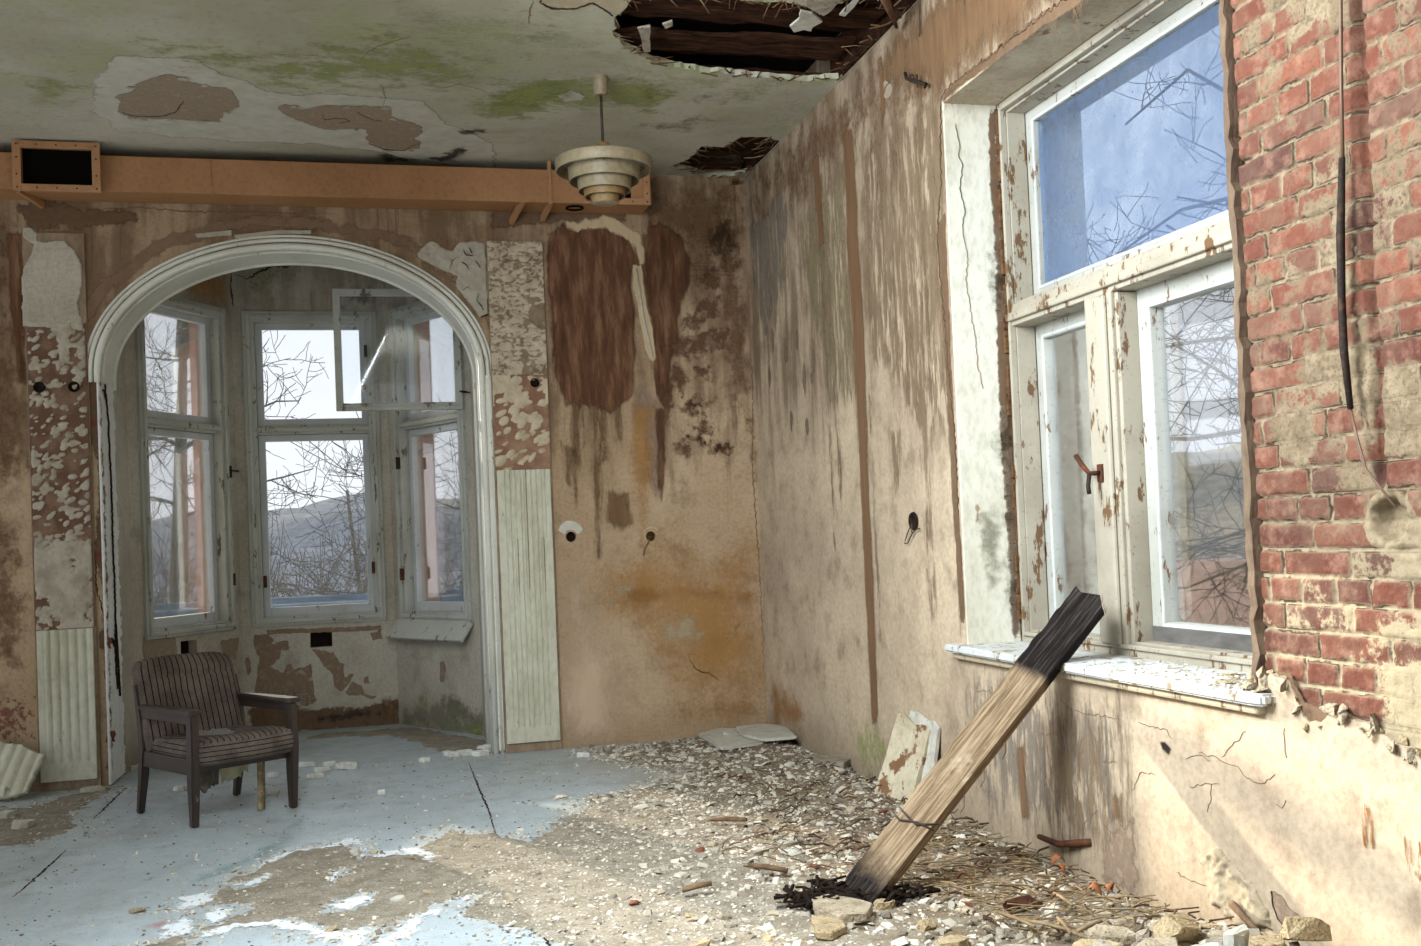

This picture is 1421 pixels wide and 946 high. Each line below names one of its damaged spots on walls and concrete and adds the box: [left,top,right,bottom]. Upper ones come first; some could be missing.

peeling [90,56,495,168]
peeling [21,215,458,330]
peeling [485,211,625,375]
crack [937,0,1067,512]
water stain [546,0,1052,776]
spalling [1230,0,1421,764]
peeling [143,636,189,659]
peeling [221,625,382,706]
water stain [982,698,1138,893]
crack [1033,700,1287,812]